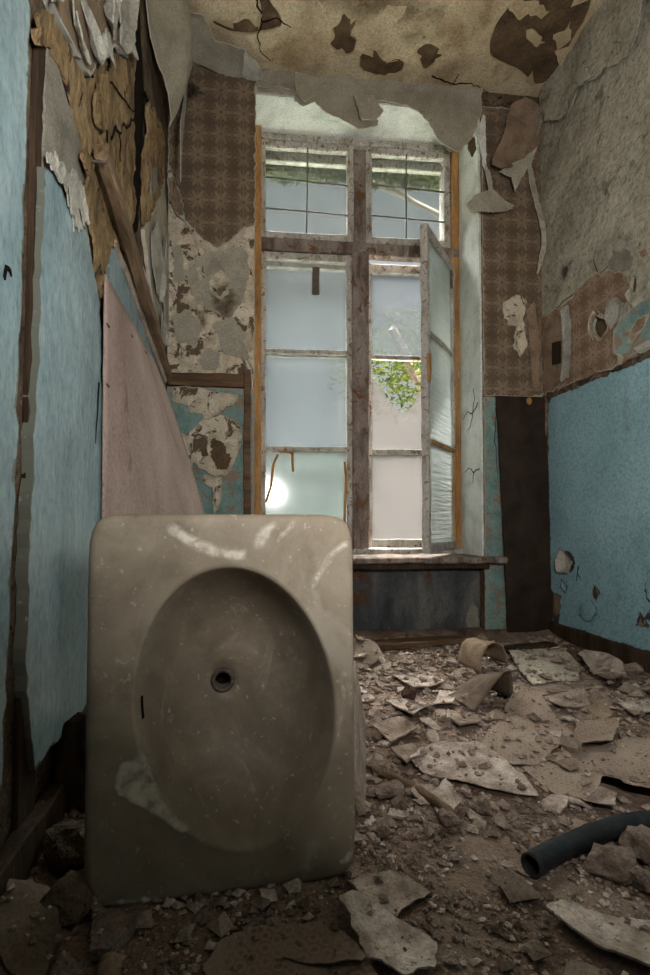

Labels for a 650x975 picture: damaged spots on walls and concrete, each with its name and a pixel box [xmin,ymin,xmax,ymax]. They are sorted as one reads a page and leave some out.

flaking render [191,0,483,152]
flaking render [490,0,591,88]
flaking render [31,0,250,370]
peeling [172,386,242,514]
peeling [554,548,572,614]